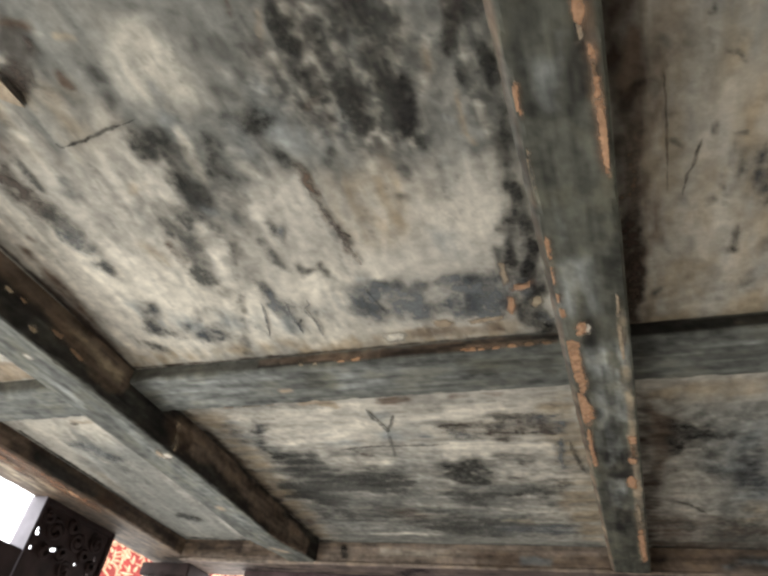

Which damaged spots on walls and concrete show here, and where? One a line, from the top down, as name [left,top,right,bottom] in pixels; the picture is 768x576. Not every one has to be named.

crack [55,121,131,148]
damp [127,128,212,252]
damp [264,7,324,100]
damp [349,181,554,333]
peeling [469,263,530,324]
peeling [512,83,522,115]
peeling [571,0,610,174]
damp [619,123,647,322]
crack [683,143,701,188]
peeling [566,322,598,467]
damp [255,424,533,537]
peeling [636,504,648,563]